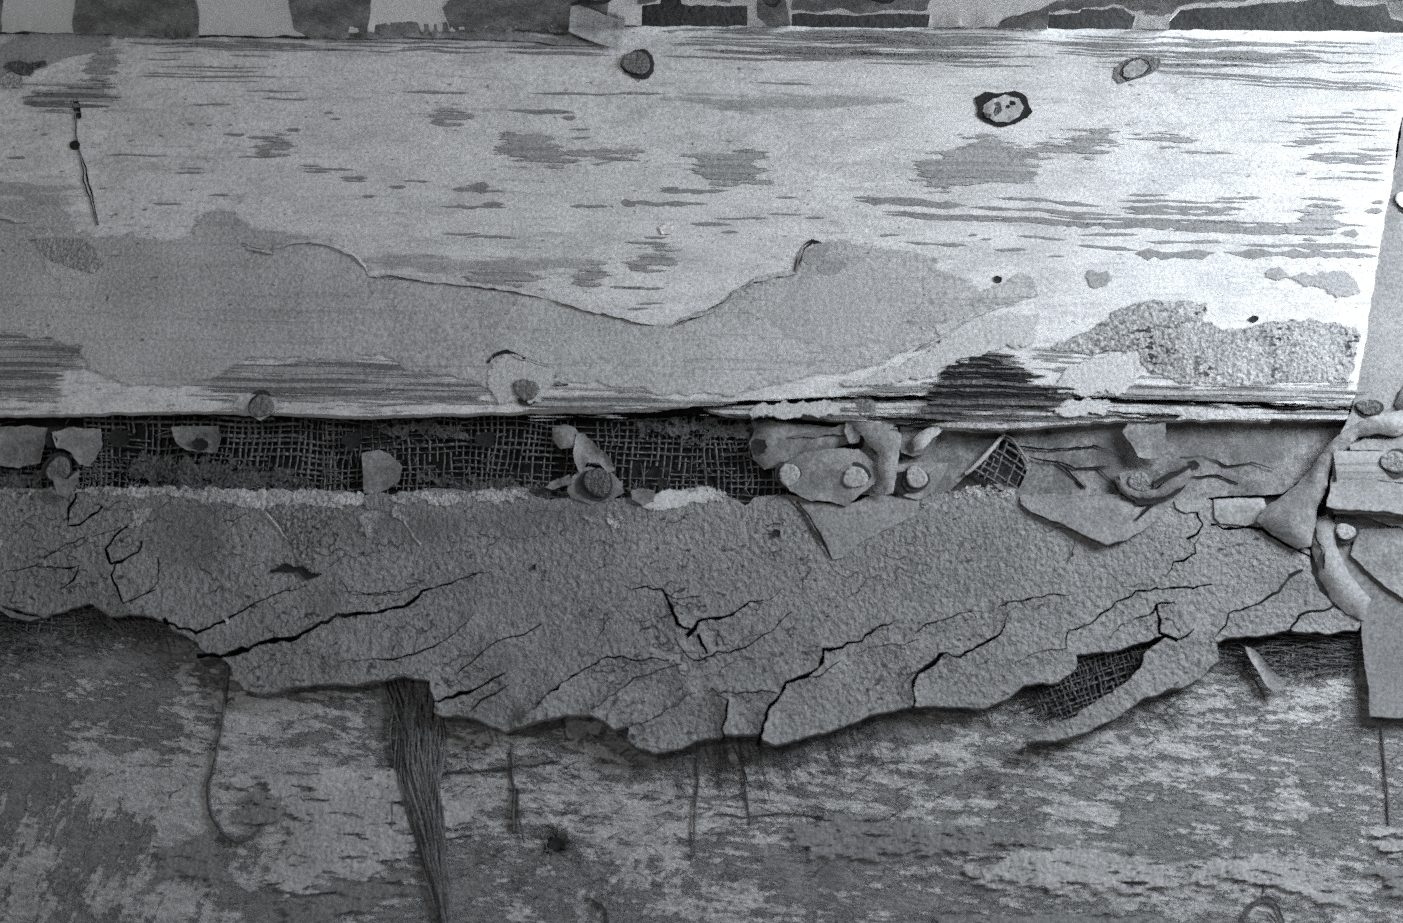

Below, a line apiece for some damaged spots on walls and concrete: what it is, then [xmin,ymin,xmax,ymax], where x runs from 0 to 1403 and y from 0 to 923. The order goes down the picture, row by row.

peeling [568,5,625,49]
peeling [0,32,122,113]
peeling [495,132,645,169]
peeling [681,149,775,188]
peeling [910,124,1200,193]
peeling [0,198,1368,427]
crack [690,394,930,438]
crack [1072,396,1351,409]
crack [0,445,1361,754]
peeling [1245,647,1285,692]
peeling [143,766,493,923]
peeling [783,800,1403,923]